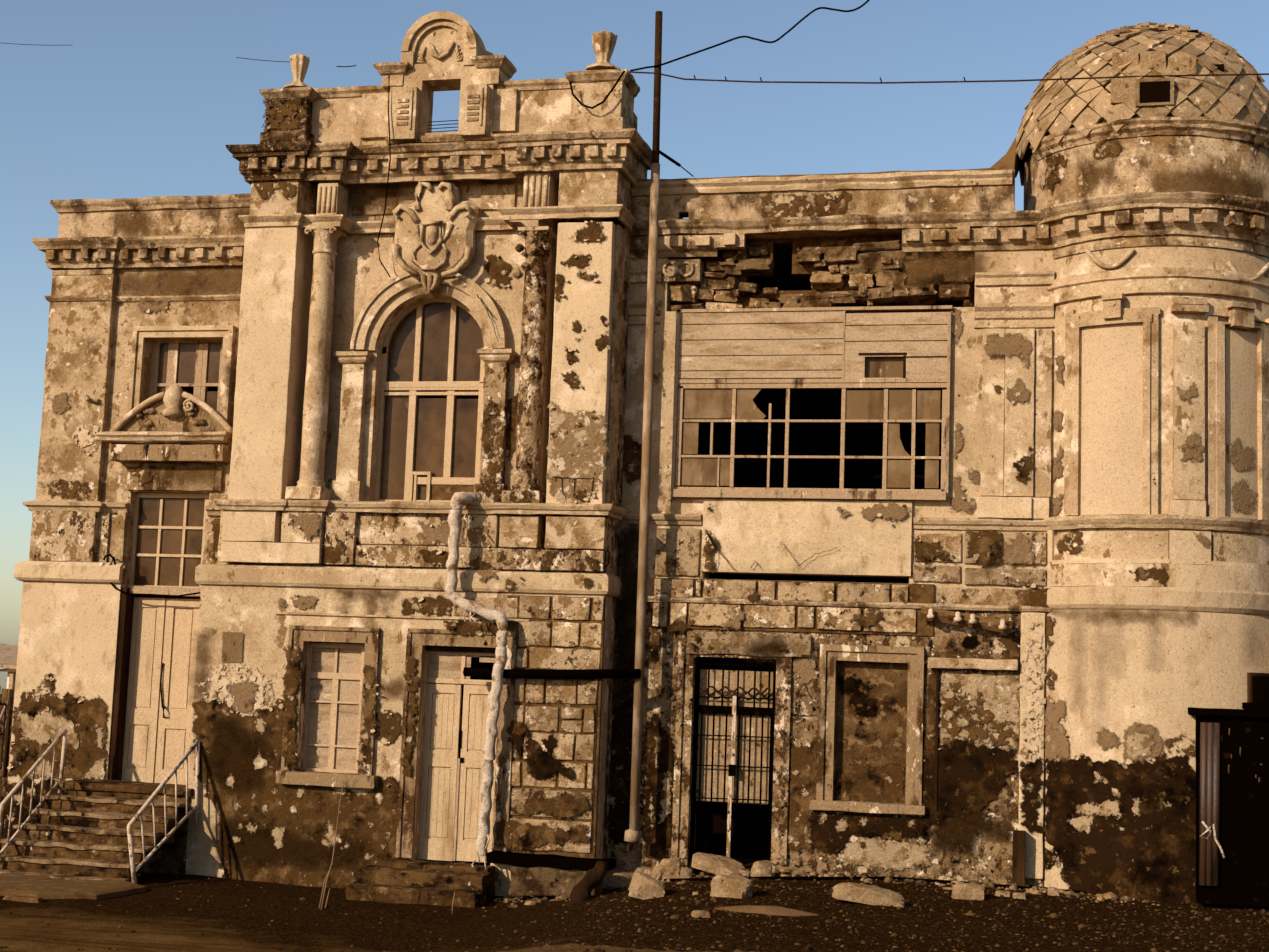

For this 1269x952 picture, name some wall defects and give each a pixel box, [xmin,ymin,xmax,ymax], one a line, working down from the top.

flaking render [553,220,607,302]
flaking render [561,315,611,390]
flaking render [981,333,1032,405]
flaking render [47,478,91,501]
flaking render [49,392,100,456]
flaking render [545,401,608,504]
flaking render [792,658,819,685]
flaking render [938,583,1070,764]
damp [190,634,413,889]
spalling [779,742,818,853]
damp [807,671,1199,904]
flaking render [841,837,932,871]